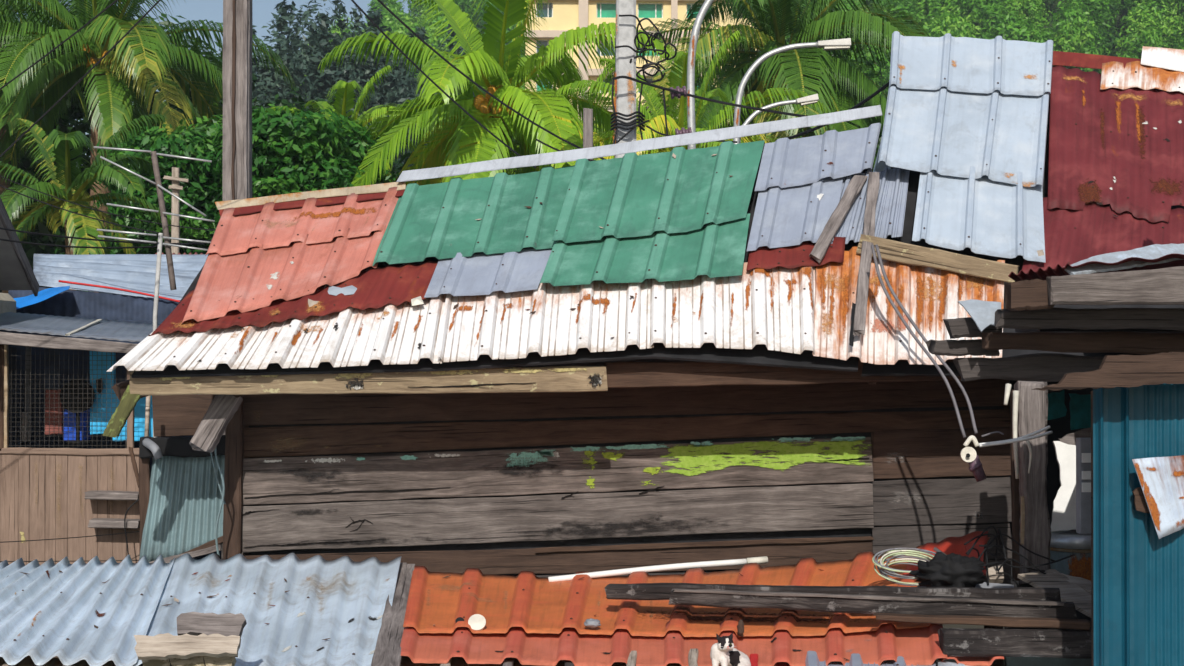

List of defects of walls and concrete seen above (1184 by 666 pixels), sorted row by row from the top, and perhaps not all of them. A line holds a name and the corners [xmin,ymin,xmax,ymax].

rust [1100,94,1146,159]
rust [295,207,375,219]
rust [291,325,323,345]
rust [449,305,485,340]
rust [576,294,610,323]
rust [731,267,850,335]
rust [870,273,985,338]
rust [1132,463,1161,531]